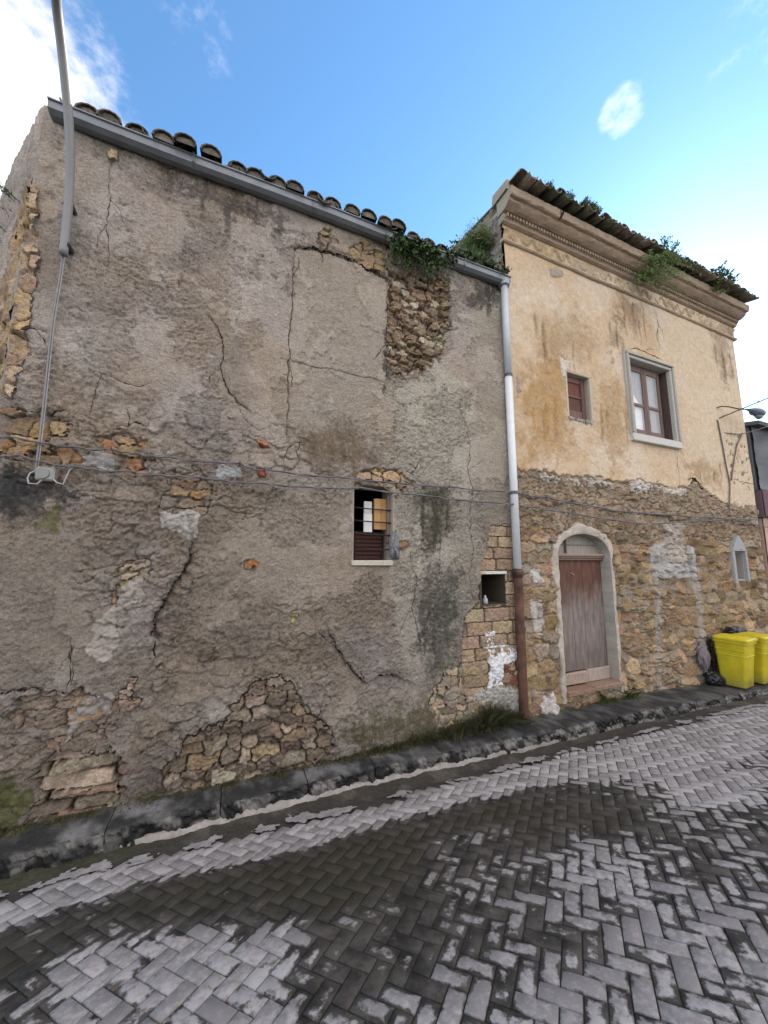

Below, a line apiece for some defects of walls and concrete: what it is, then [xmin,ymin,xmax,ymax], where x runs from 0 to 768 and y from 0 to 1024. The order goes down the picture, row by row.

crack [97,166,123,267]
spalling [0,176,97,465]
crack [206,323,248,423]
crack [283,246,388,462]
spalling [350,238,452,380]
water stain [0,464,73,530]
crack [150,541,193,657]
crack [319,633,400,683]
water stain [414,483,465,680]
spalling [428,524,518,732]
spalling [9,677,141,821]
spalling [162,674,335,794]